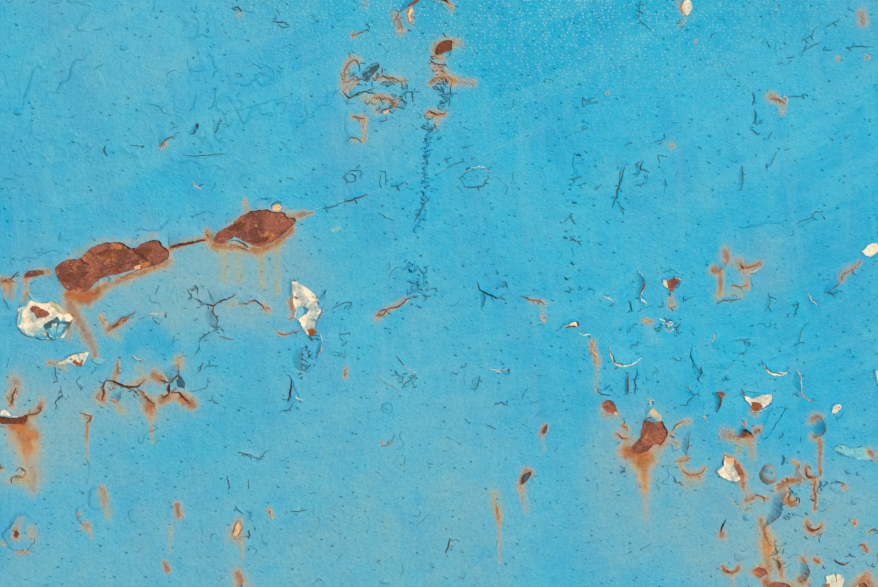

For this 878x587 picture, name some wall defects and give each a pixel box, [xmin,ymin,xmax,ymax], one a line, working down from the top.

rust [431,32,454,57]
rust [205,198,311,254]
peeling [3,292,75,340]
rust [23,229,174,336]
peeling [277,278,327,337]
rust [600,397,678,488]
peeling [739,388,787,439]
peeling [812,402,844,455]
rust [518,470,532,485]
peeling [715,453,746,489]
rust [750,540,795,587]
peeling [798,544,869,587]